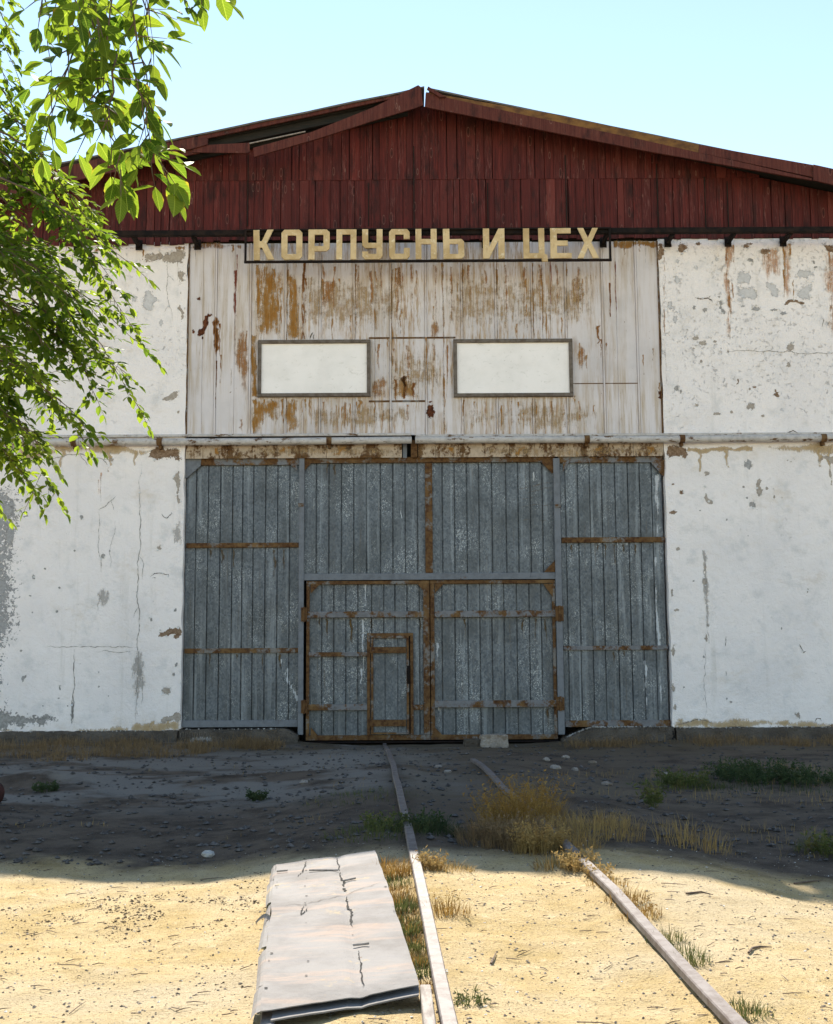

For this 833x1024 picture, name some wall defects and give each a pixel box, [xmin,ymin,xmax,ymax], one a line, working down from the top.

rust [175,243,241,313]
spalling [657,242,700,263]
rust [724,245,734,321]
peeling [693,243,817,315]
rust [764,244,794,295]
rust [192,314,222,408]
rust [235,262,595,433]
spalling [148,446,182,503]
spalling [666,445,688,459]
peeling [0,484,58,731]
crack [49,463,173,725]
spalling [148,617,182,639]